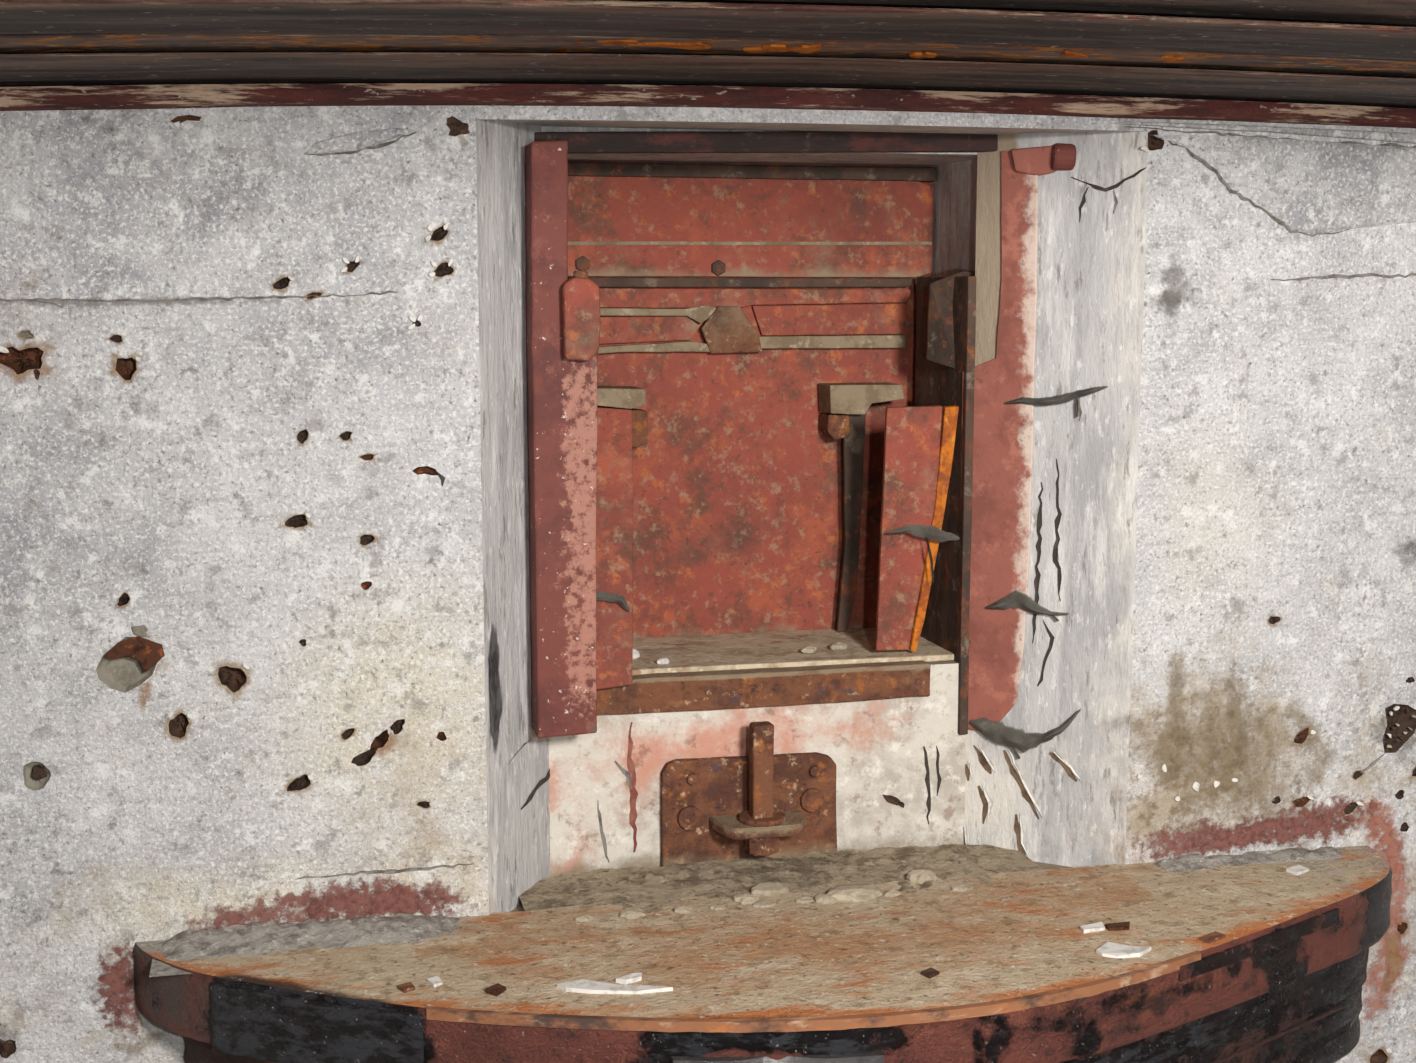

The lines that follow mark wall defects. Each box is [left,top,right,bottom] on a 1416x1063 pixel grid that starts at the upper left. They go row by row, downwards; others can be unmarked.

corrosion [909,405,959,652]
crack [1032,459,1062,686]
crack [923,746,942,824]